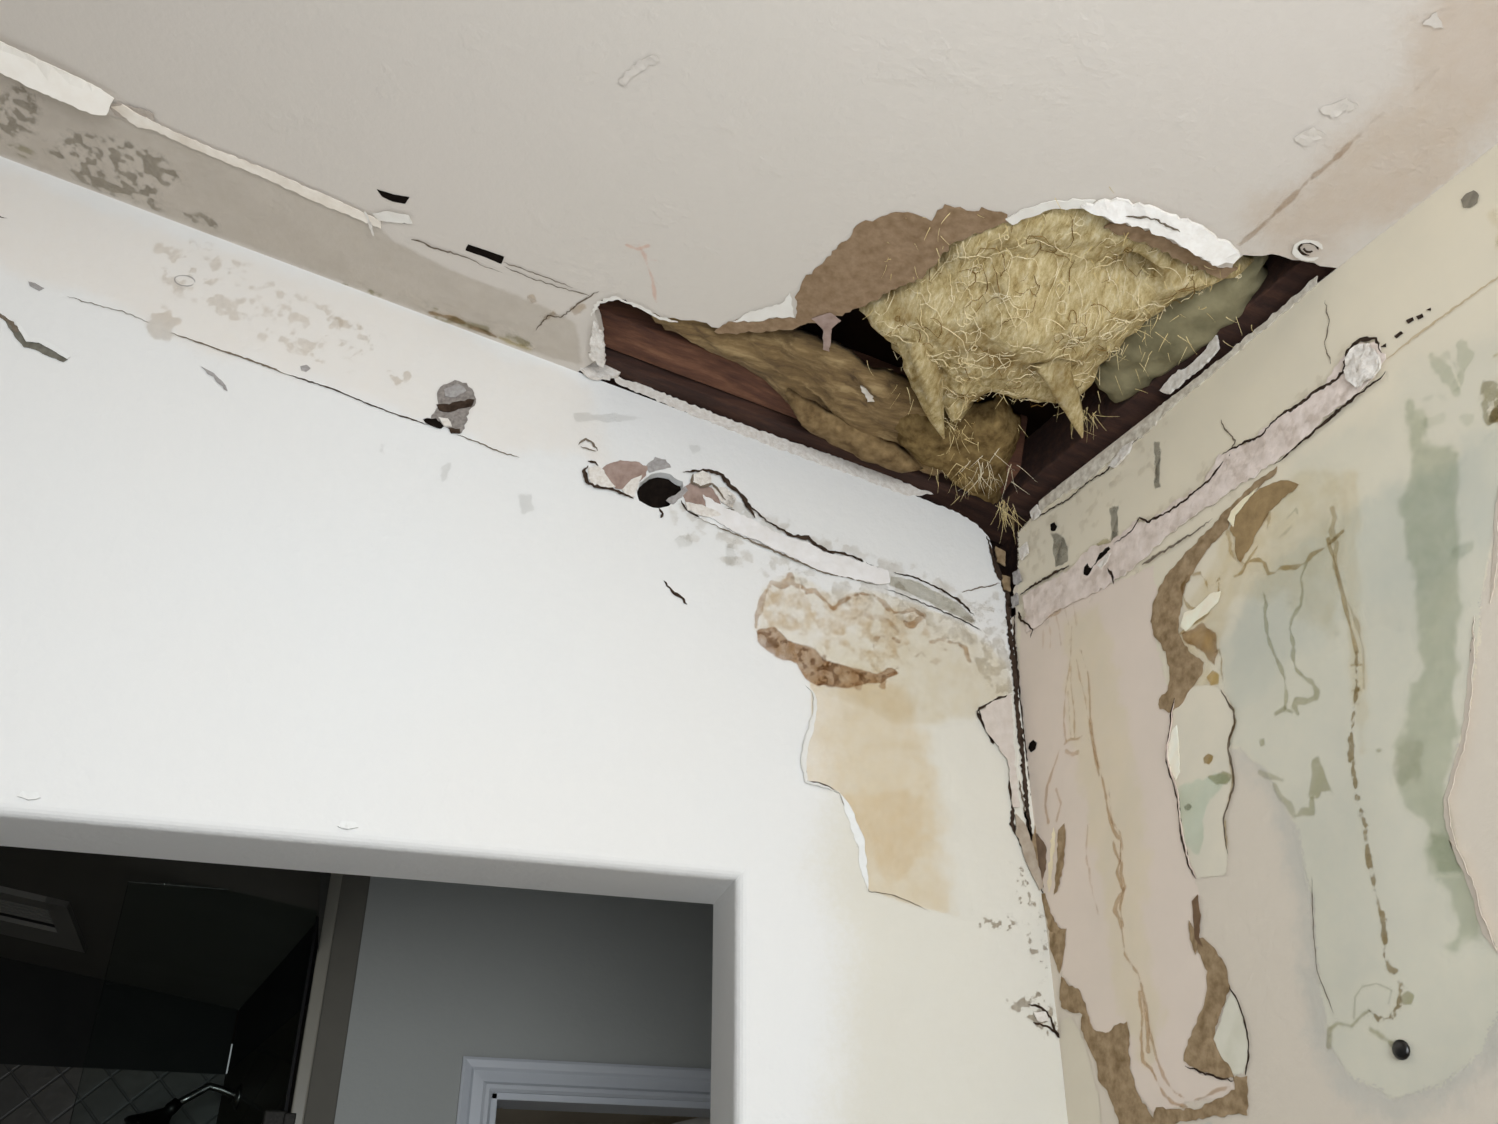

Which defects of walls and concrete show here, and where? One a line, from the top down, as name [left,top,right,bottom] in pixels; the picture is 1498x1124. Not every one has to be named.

peeling [0,41,381,228]
crack [0,314,70,362]
spalling [423,380,476,434]
spalling [579,438,755,518]
spalling [580,296,933,496]
crack [698,304,1386,893]
peeling [1005,143,1498,1115]
damp [801,676,926,910]